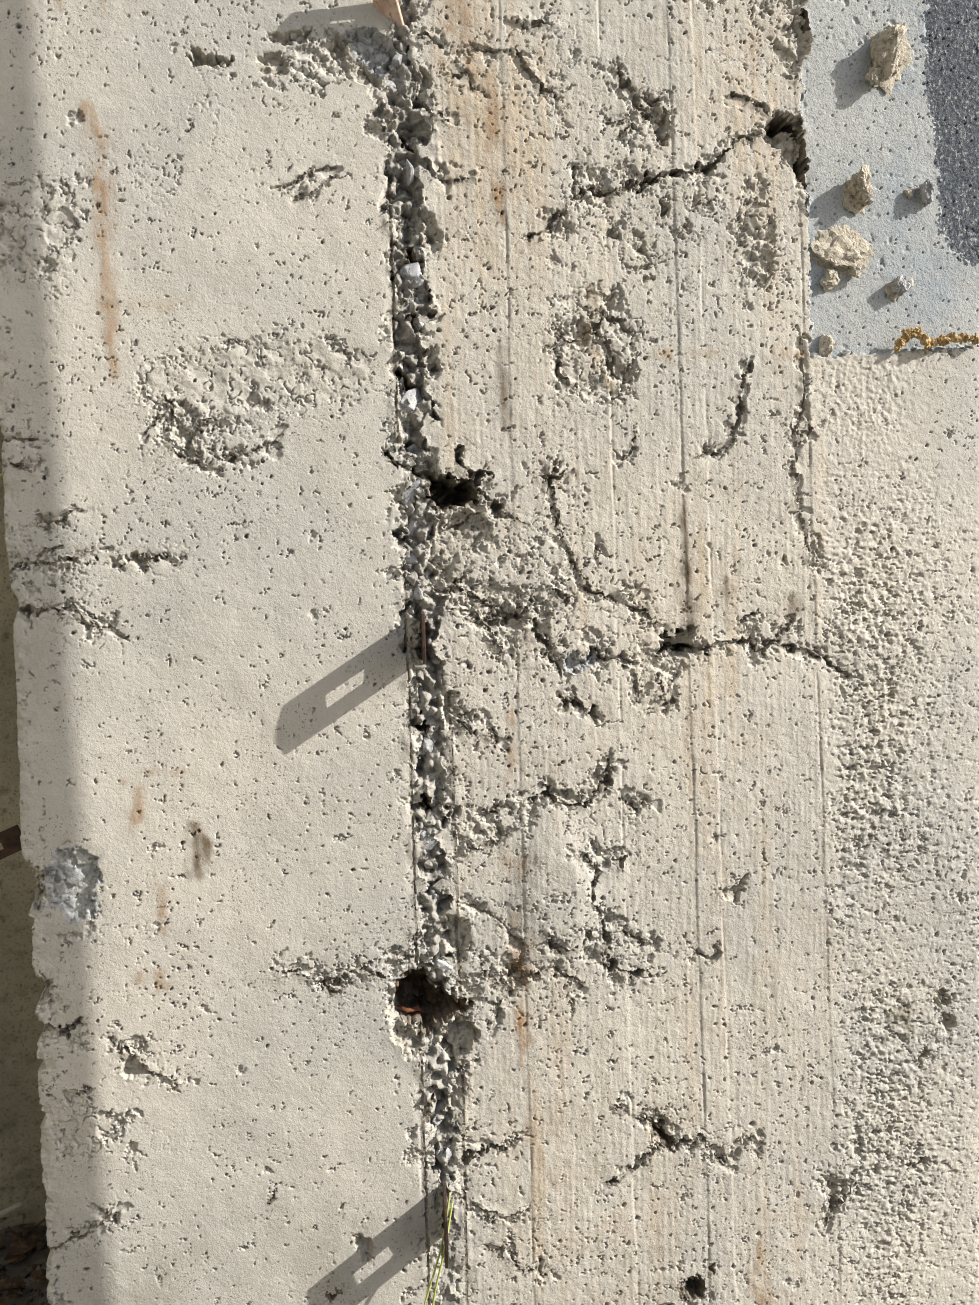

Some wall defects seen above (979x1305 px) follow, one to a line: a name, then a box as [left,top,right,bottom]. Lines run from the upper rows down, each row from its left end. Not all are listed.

crack [415,15,557,100]
crack [527,91,769,243]
flaking render [761,0,979,360]
peeling [735,194,788,294]
spalling [424,503,488,594]
crack [450,463,657,723]
crack [697,608,852,678]
spalling [446,803,514,853]
crack [517,758,651,813]
spalling [28,844,105,924]
spalling [438,908,474,966]
crack [605,1098,726,1186]